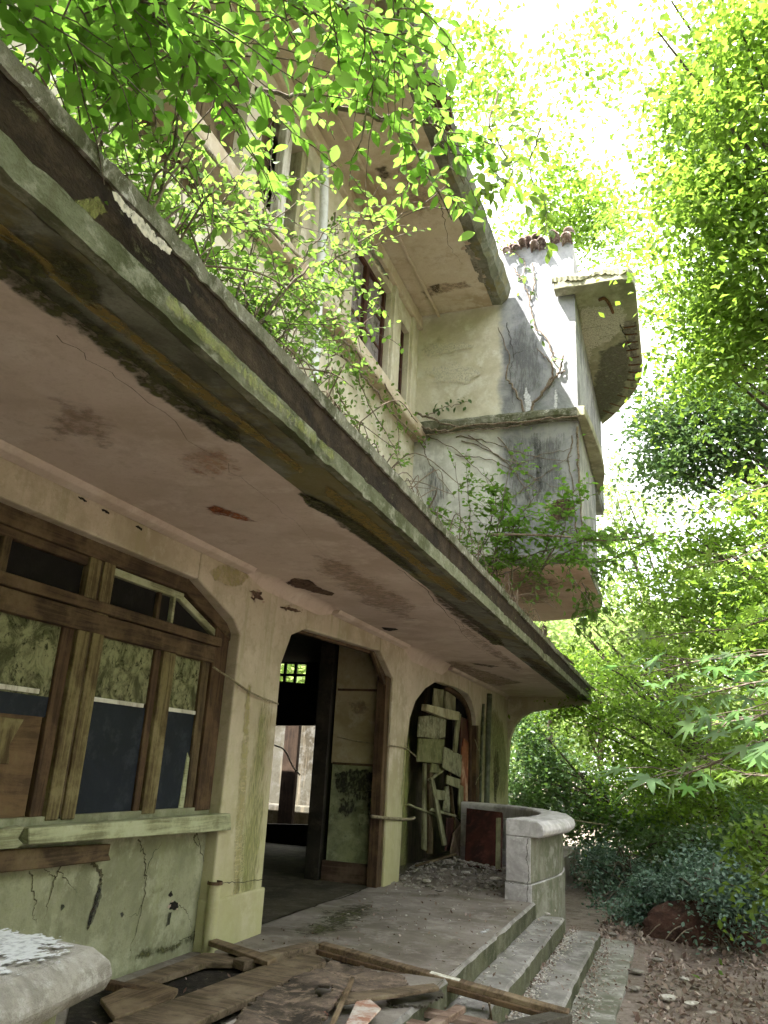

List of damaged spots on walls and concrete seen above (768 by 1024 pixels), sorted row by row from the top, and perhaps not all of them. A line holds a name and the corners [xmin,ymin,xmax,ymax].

leakage [510,325,543,411]
leakage [594,341,631,419]
leakage [506,433,561,502]
rust [207,506,248,521]
peeling [286,578,335,597]
leakage [235,686,251,894]
crack [29,862,103,930]
crack [129,839,160,953]
spalling [166,891,179,926]